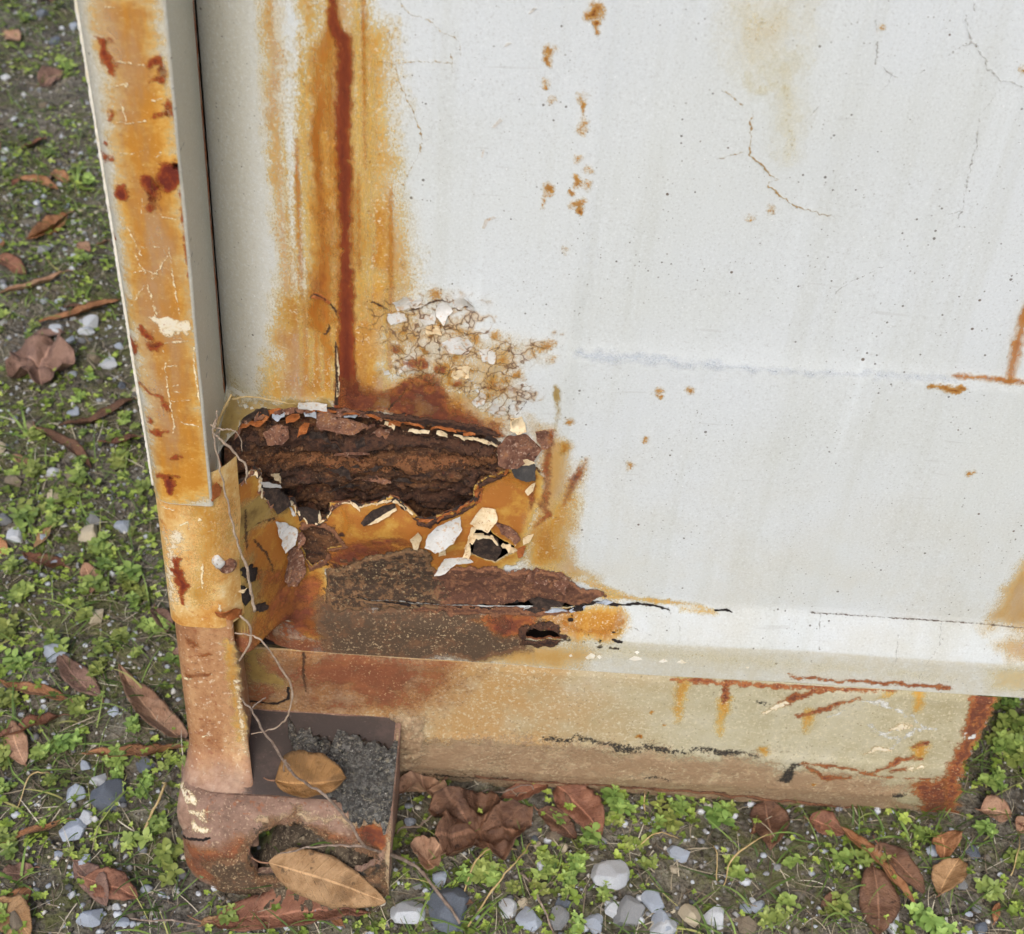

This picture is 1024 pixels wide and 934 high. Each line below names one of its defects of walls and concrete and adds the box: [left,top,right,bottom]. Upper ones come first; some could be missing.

crack [720,92,825,215]
rust [927,308,1024,395]
peeling [239,402,368,446]
rust [89,0,715,800]
peeling [260,473,321,587]
peeling [361,503,397,526]
peeling [410,488,534,576]
crack [575,601,670,629]
crack [811,611,1018,650]
rust [670,673,951,737]
rust [800,561,1024,814]
rust [301,819,392,881]